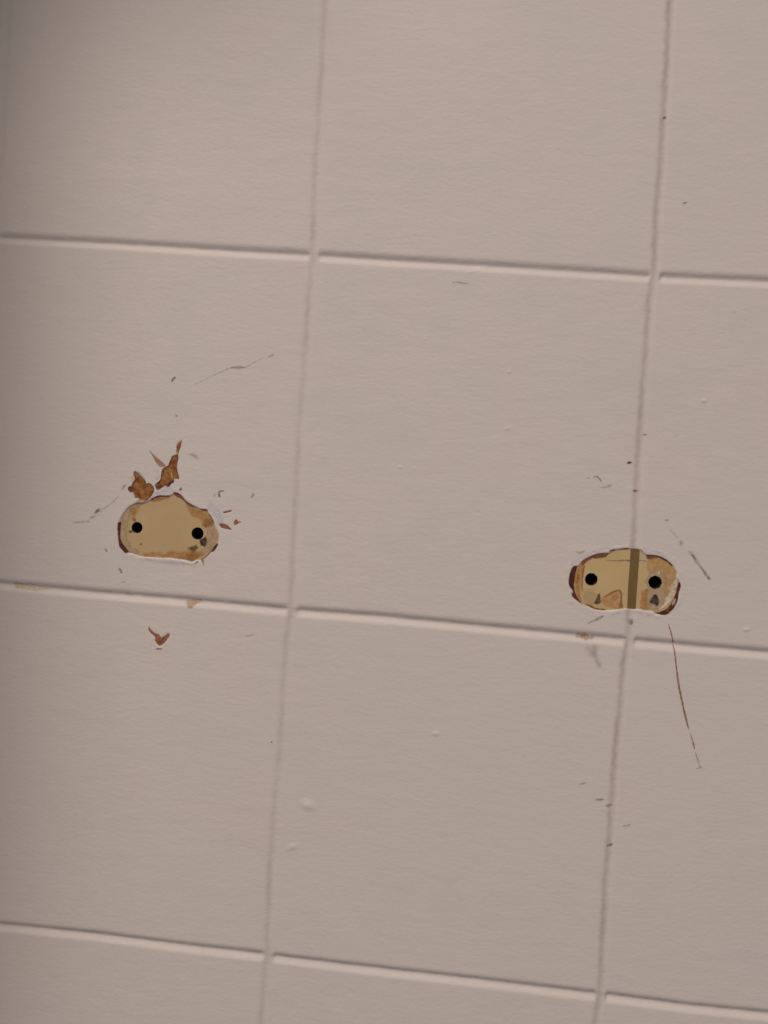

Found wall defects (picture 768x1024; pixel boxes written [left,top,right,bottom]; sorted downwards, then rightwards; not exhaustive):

peeling [111,440,241,569]
spalling [148,627,170,650]
peeling [561,541,687,622]
crack [669,627,699,763]